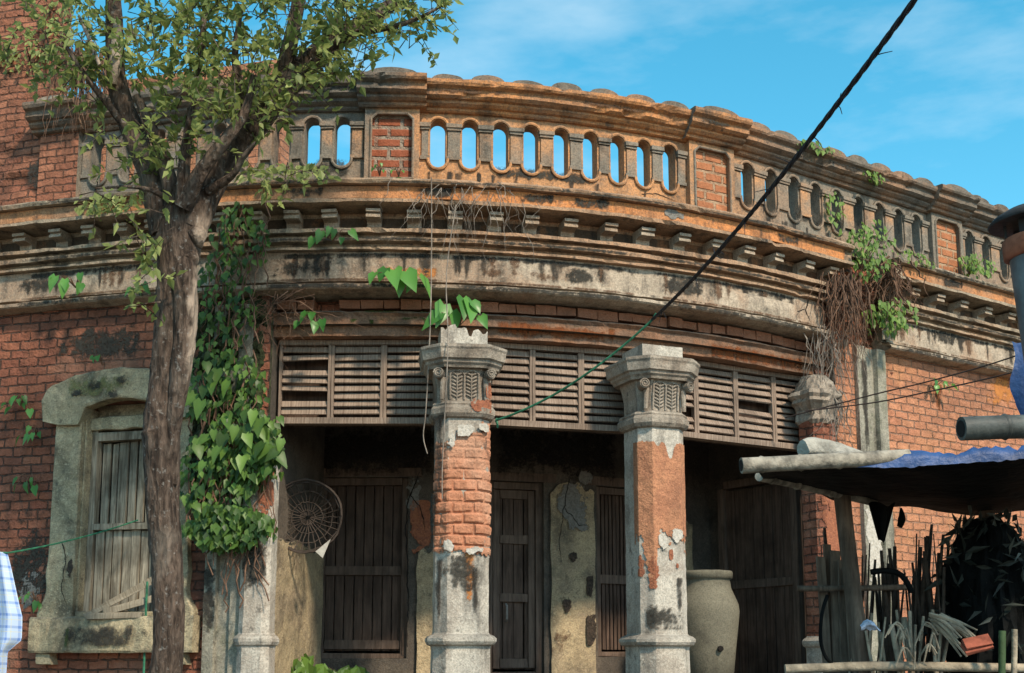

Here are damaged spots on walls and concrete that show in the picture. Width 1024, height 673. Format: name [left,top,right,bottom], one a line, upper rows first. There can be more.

damp [268,237,443,288]
damp [453,239,636,301]
damp [59,326,140,360]
flaking render [405,383,492,557]
flaking render [633,441,687,589]
damp [435,555,478,614]
damp [646,578,682,629]
damp [64,625,132,646]